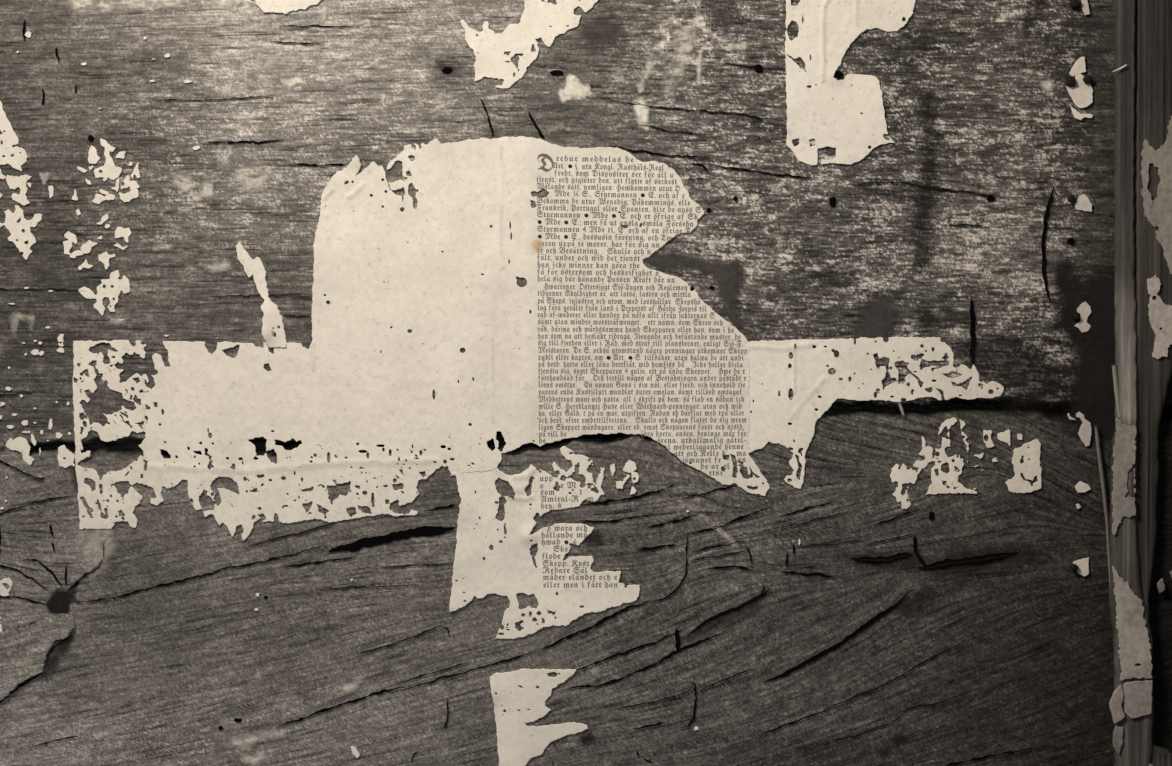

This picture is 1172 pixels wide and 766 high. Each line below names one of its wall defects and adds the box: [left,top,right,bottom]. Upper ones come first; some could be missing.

peeling [63,146,140,270]
peeling [643,253,745,327]
peeling [856,294,897,338]
crack [1041,185,1055,301]
crack [0,496,460,632]
crack [0,635,70,702]
crack [275,484,1018,766]
crack [946,746,1053,766]